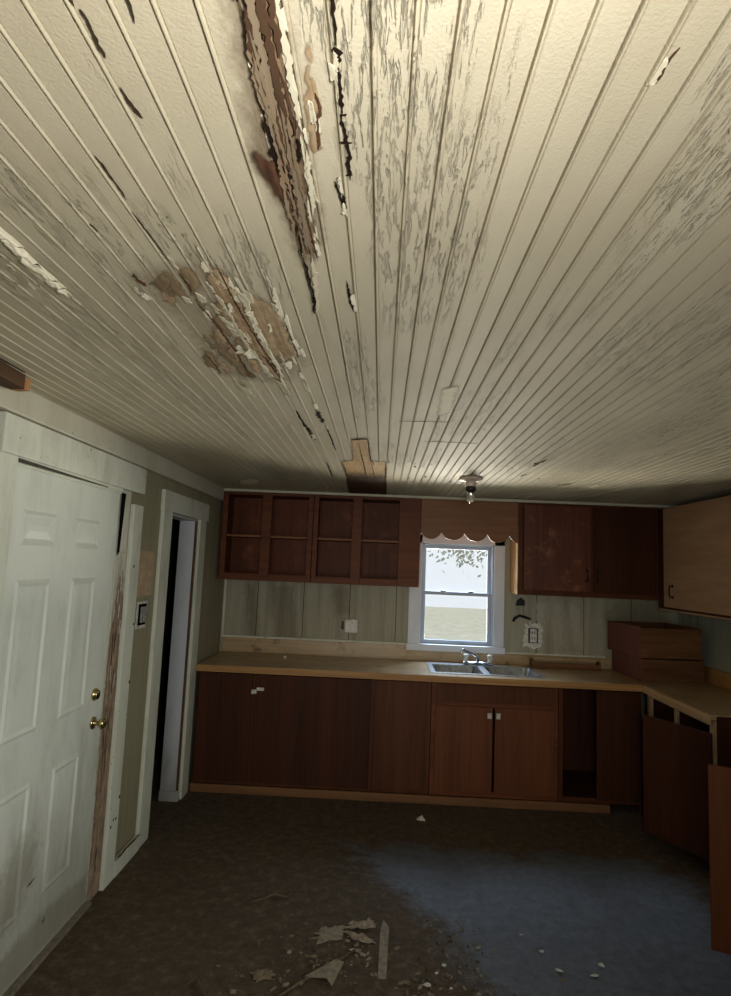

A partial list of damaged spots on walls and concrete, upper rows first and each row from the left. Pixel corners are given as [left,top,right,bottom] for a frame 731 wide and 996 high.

crack [70,0,106,59]
crack [126,0,135,24]
peeling [647,48,680,87]
crack [120,87,143,119]
crack [328,0,353,216]
peeling [236,0,322,314]
peeling [130,246,311,397]
peeling [296,403,336,450]
peeling [342,439,387,497]